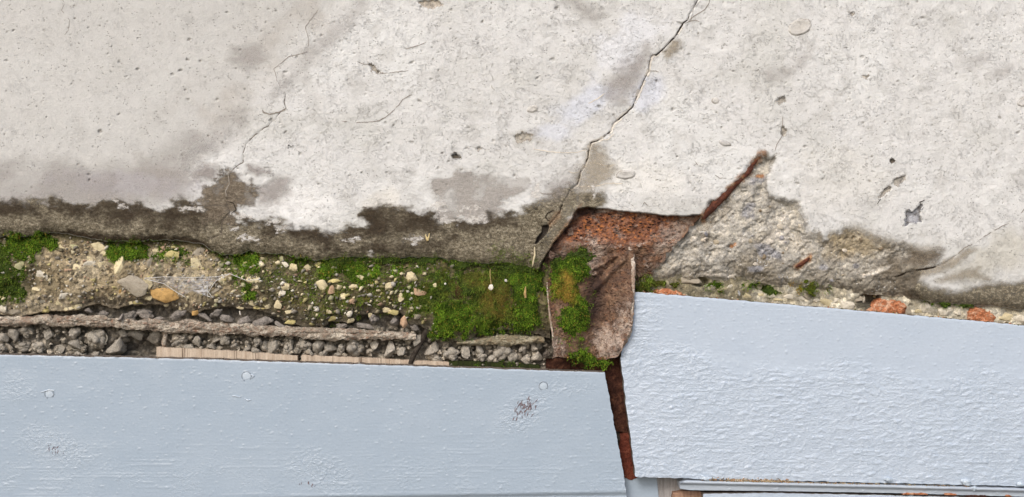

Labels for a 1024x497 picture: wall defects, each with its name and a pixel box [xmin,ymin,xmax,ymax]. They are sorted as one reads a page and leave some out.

crack [198,12,317,239]
crack [533,0,710,244]
damp [0,144,613,270]
spalling [643,155,923,300]
damp [849,229,1024,310]